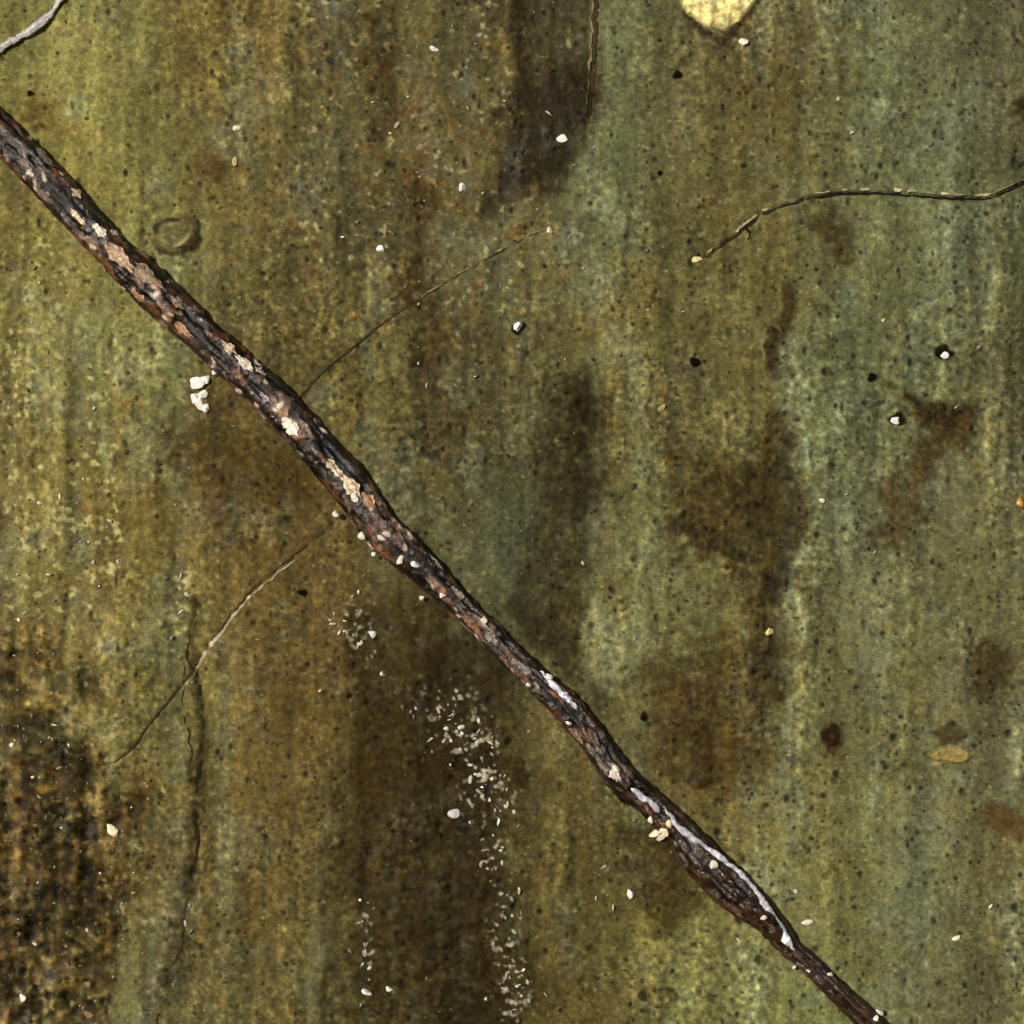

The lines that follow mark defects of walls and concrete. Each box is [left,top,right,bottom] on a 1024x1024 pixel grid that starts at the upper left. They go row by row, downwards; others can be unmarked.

spalling [682,0,758,44]
leakage [479,0,602,217]
corrosion [805,197,851,264]
crack [690,179,1024,261]
corrosion [763,281,794,370]
leakage [508,379,615,706]
leakage [638,416,808,791]
crack [104,516,340,1024]
corrosion [821,724,843,755]